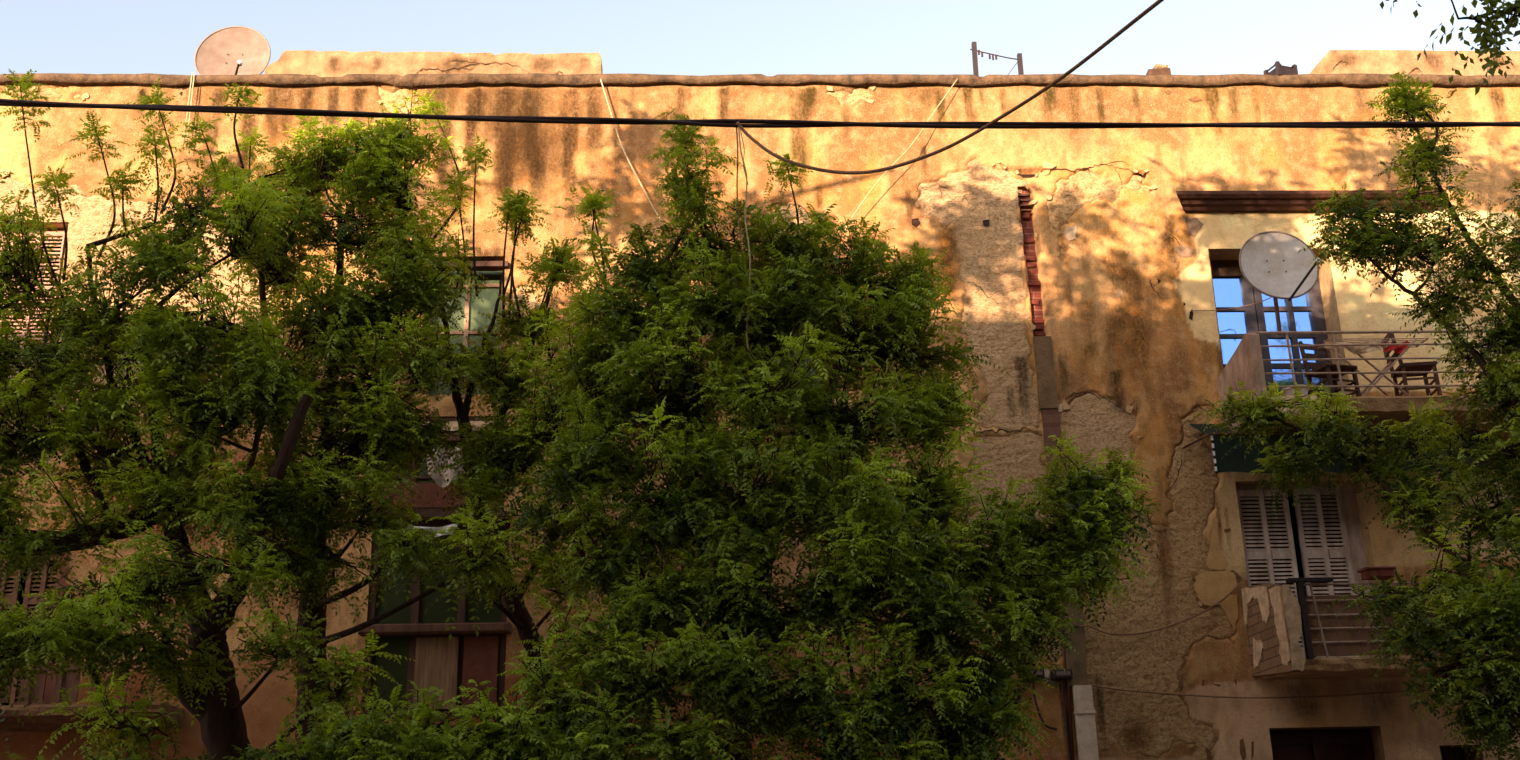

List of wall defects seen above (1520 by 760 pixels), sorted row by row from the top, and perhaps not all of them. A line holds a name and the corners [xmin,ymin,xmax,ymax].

leakage [427,58,600,194]
leakage [791,88,813,179]
peeling [1174,218,1203,257]
spalling [0,170,276,477]
spalling [912,159,1157,560]
spalling [1058,393,1242,760]
peeling [1240,738,1254,760]